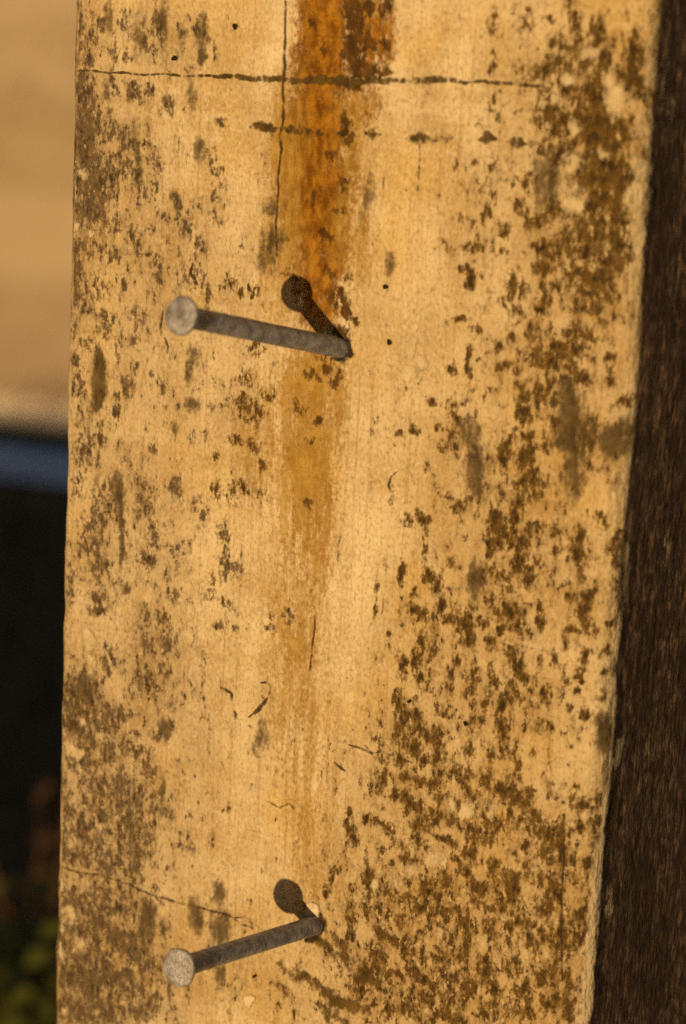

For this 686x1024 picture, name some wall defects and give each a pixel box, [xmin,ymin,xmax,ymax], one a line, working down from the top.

damp [257,228,286,268]
crack [77,0,542,256]
corrosion [260,0,395,340]
corrosion [280,351,346,572]
damp [270,0,658,1024]
crack [67,869,252,929]